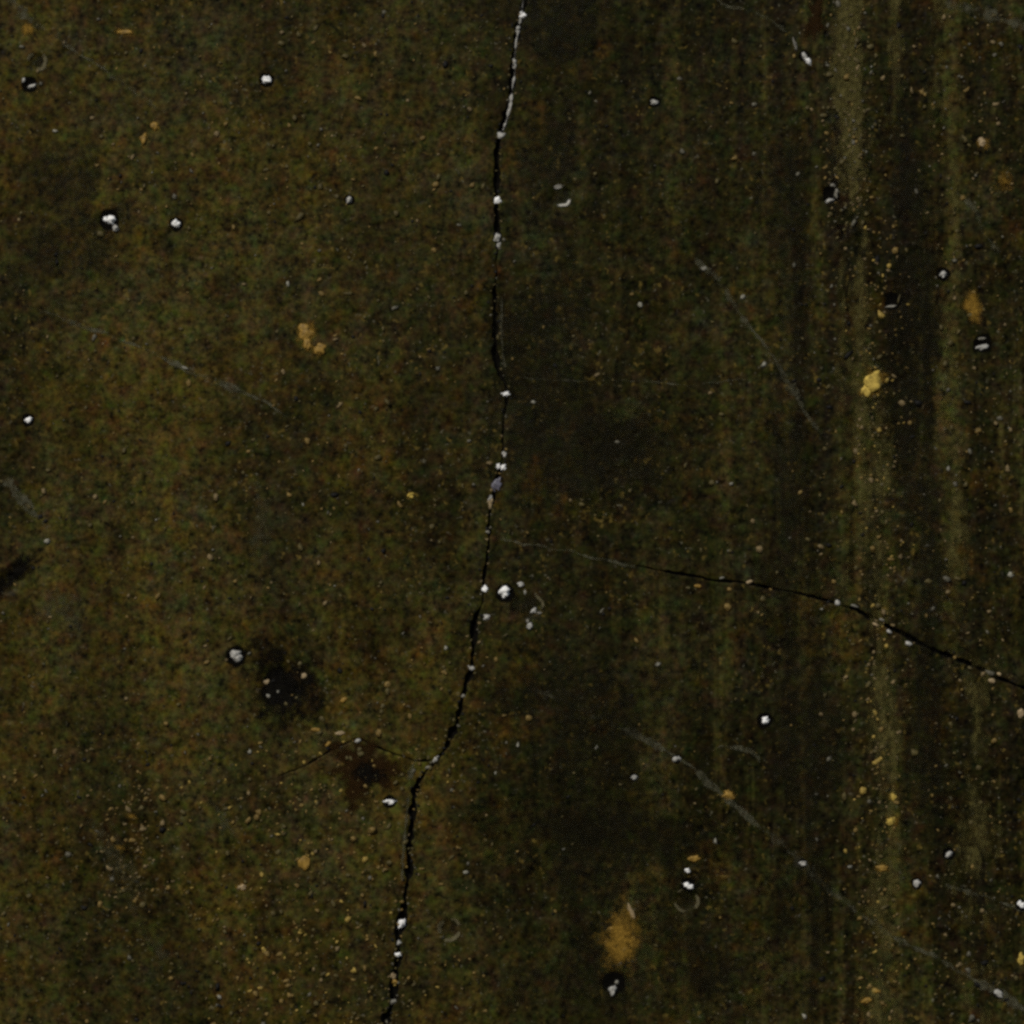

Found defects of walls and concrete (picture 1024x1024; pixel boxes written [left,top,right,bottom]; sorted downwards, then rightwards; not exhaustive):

crack [947,4,1024,28]
crack [697,260,818,428]
crack [279,0,541,1024]
crack [572,550,1024,693]
water stain [254,640,410,809]
crack [624,729,758,826]
crack [866,919,1024,1011]